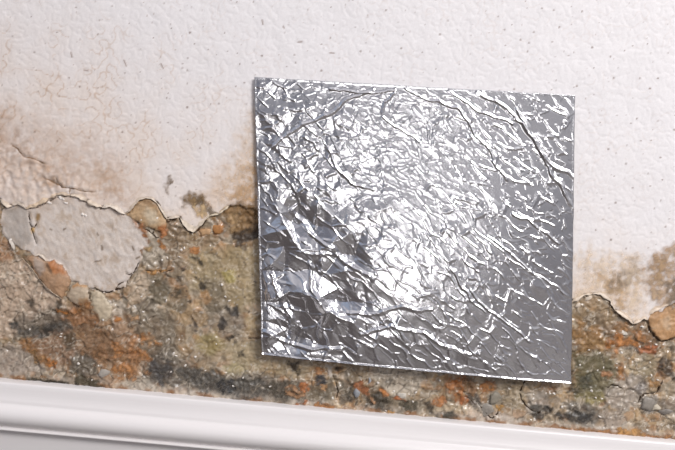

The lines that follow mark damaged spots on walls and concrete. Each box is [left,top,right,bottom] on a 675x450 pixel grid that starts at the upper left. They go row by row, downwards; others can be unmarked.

crack [12,145,111,244]
leakage [184,193,259,250]
leakage [578,244,675,314]
leakage [10,319,71,338]
leakage [218,306,238,330]
flaking render [0,192,675,439]
leakage [658,357,675,380]
leakage [36,375,102,387]
leakage [148,360,300,403]
leakage [366,392,391,410]
leakage [530,404,592,423]